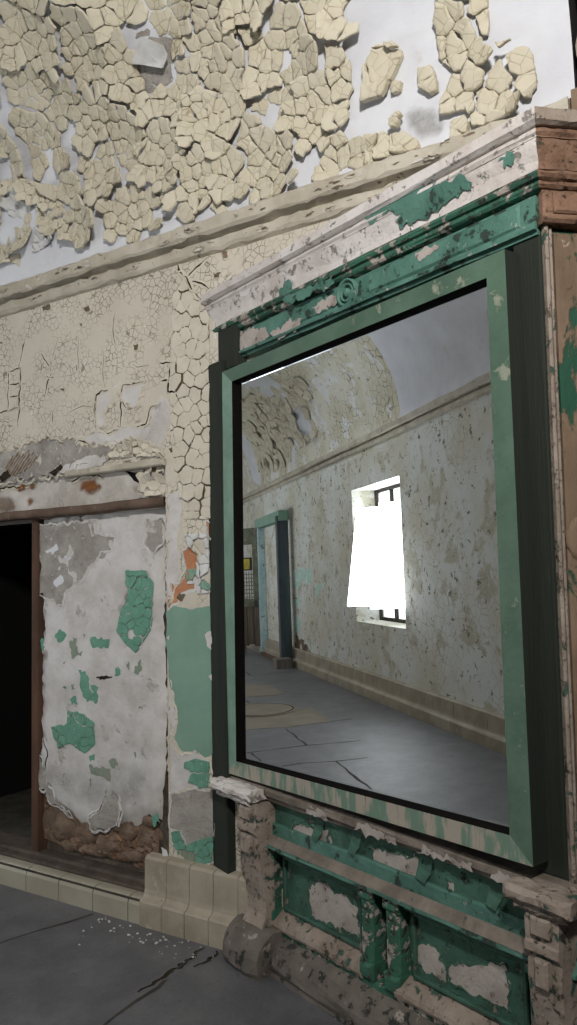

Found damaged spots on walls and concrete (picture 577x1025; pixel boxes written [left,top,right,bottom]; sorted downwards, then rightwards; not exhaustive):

peeling [0,0,538,290]
peeling [313,295,340,314]
peeling [240,318,302,350]
crack [0,256,210,520]
spalling [0,381,211,653]
spalling [43,672,215,869]
peeling [293,806,332,843]
peeling [353,822,473,876]
peeling [490,870,510,883]
peeling [309,882,360,937]
crack [135,947,221,993]
peeling [412,944,511,1012]